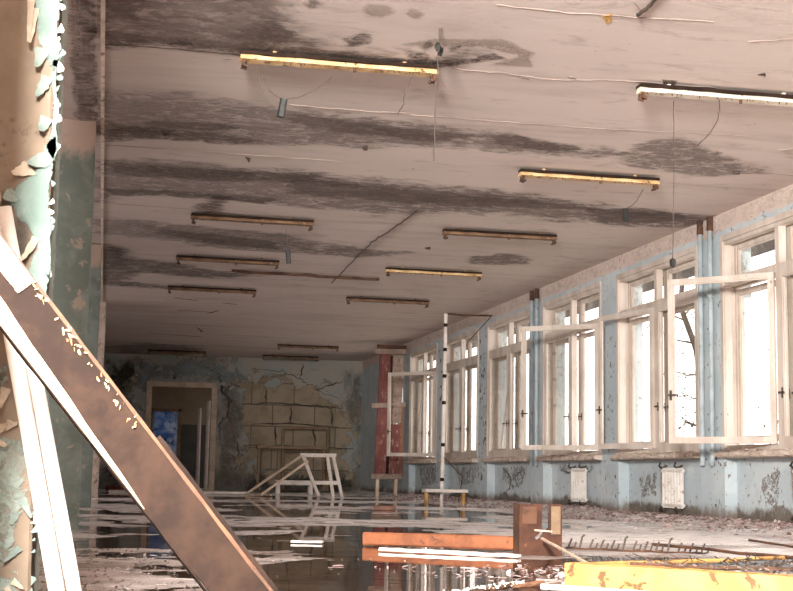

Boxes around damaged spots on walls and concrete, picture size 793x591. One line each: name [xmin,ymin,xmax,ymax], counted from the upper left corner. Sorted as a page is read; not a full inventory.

water stain [69,0,768,176]
peeling [0,0,68,301]
water stain [94,159,706,227]
crack [206,367,248,470]
flaking render [234,374,361,486]
crack [253,364,343,398]